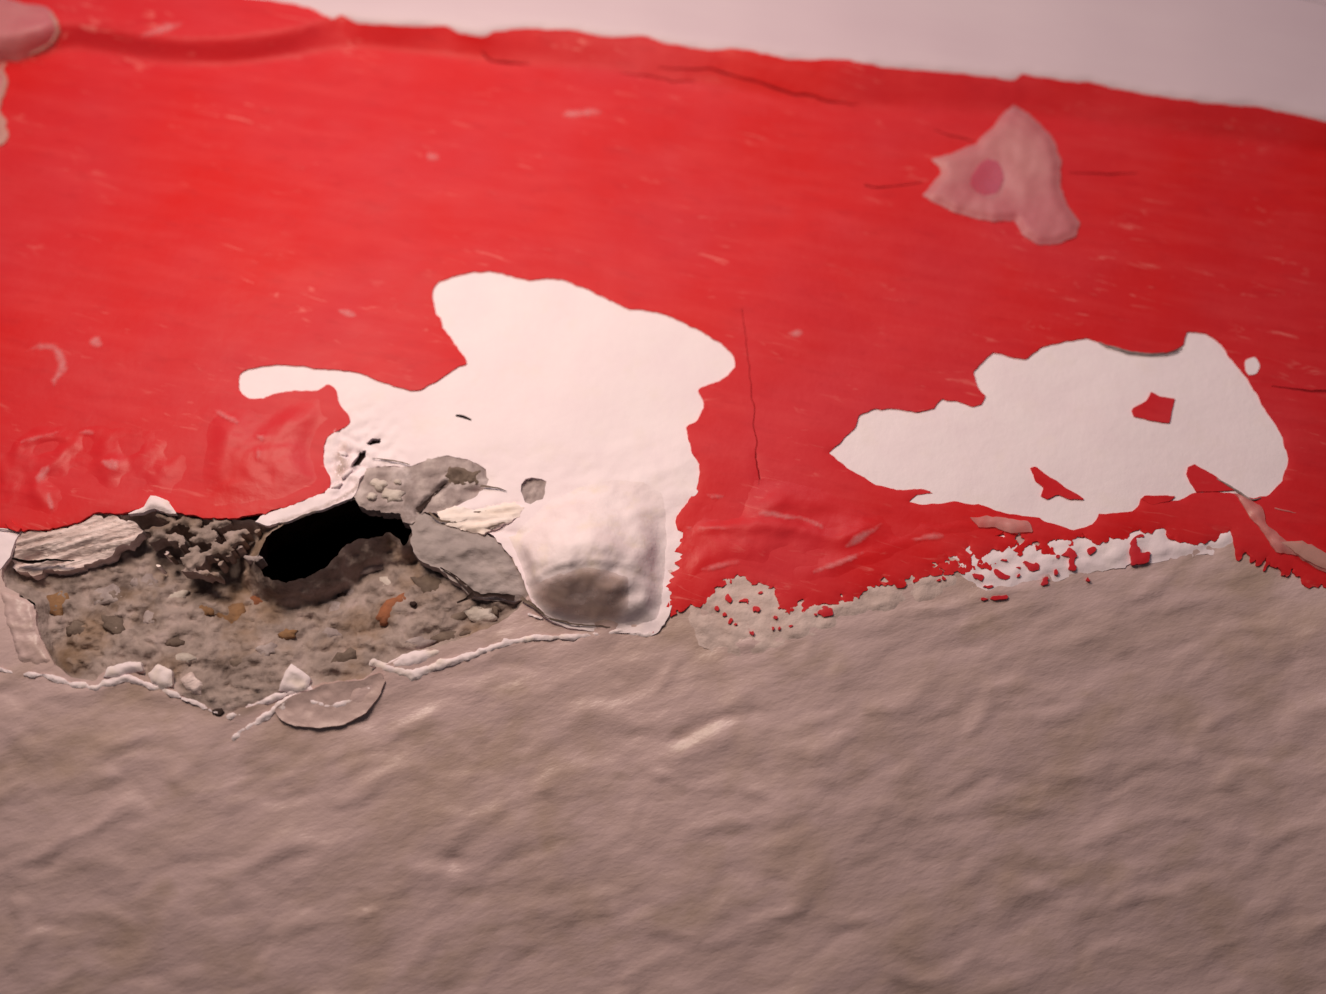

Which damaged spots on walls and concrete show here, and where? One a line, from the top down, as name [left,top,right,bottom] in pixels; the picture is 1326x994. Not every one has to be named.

spalling [0,272,735,741]
crack [742,311,760,480]
peeling [688,332,1288,656]